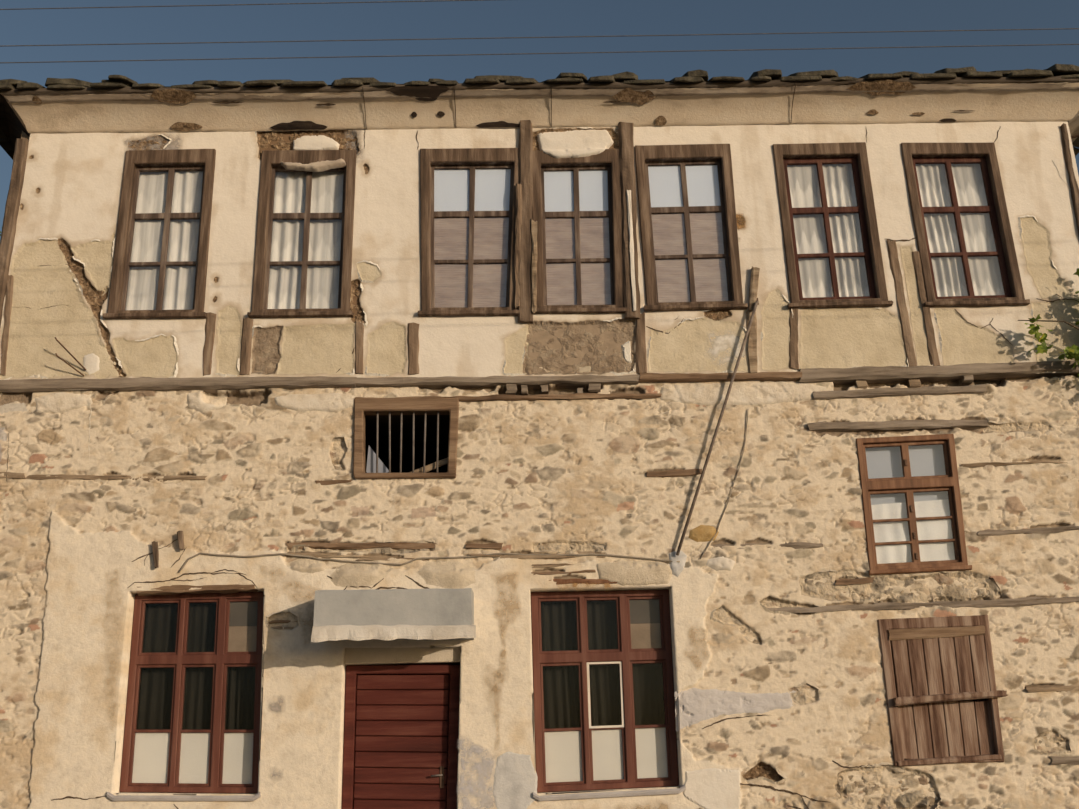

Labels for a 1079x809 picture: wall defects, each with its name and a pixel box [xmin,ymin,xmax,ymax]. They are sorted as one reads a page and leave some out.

flaking render [0,230,179,380]
flaking render [213,260,407,377]
flaking render [502,246,1014,376]
crack [955,309,1011,344]
flaking render [1018,215,1079,362]
crack [128,539,256,588]
flaking render [265,610,300,631]